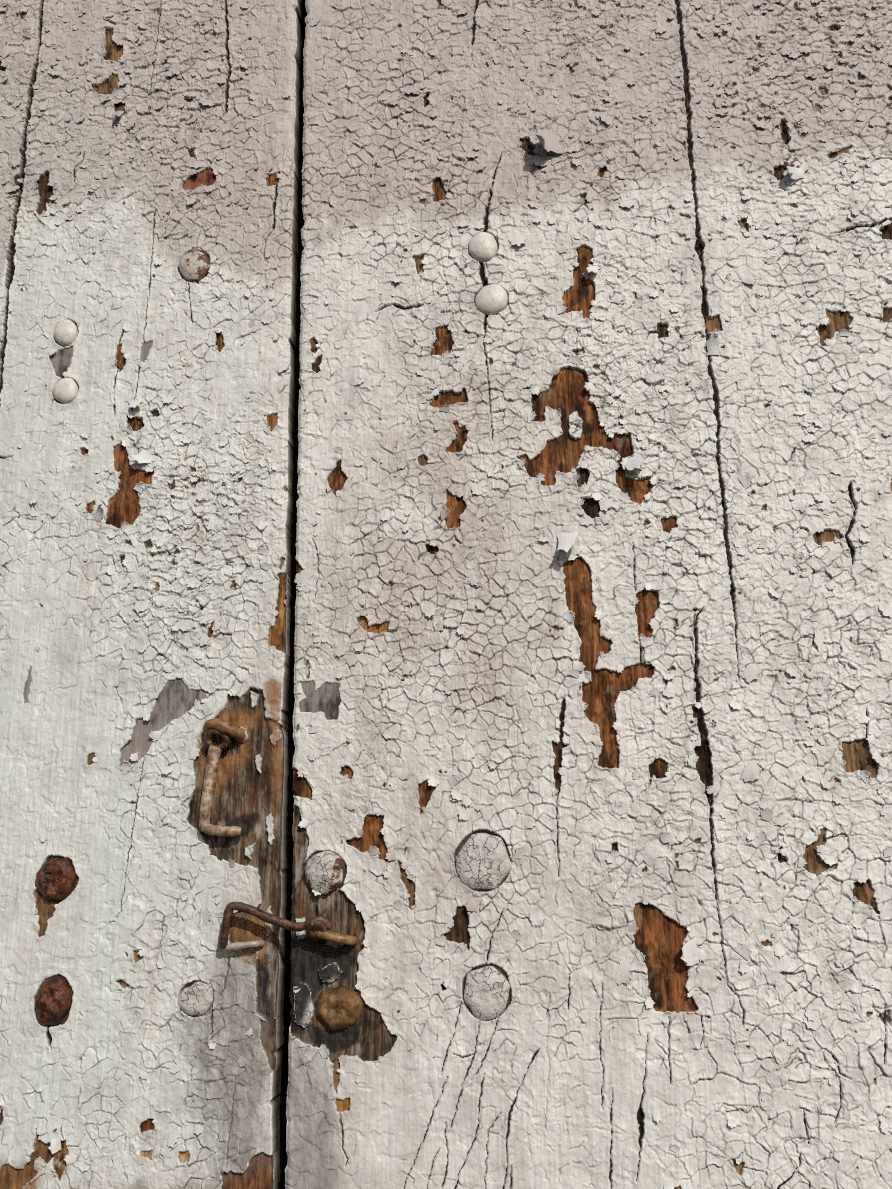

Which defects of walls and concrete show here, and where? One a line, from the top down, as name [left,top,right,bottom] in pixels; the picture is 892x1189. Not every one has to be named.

crack [0,0,44,393]
crack [675,0,740,679]
peeling [85,400,163,533]
peeling [517,349,656,519]
rust [199,711,256,791]
rust [266,681,282,805]
peeling [556,532,659,769]
rust [230,915,269,962]
peeling [187,688,397,1112]
peeling [628,899,699,1017]
crack [404,1002,539,1189]
crack [599,984,671,1189]